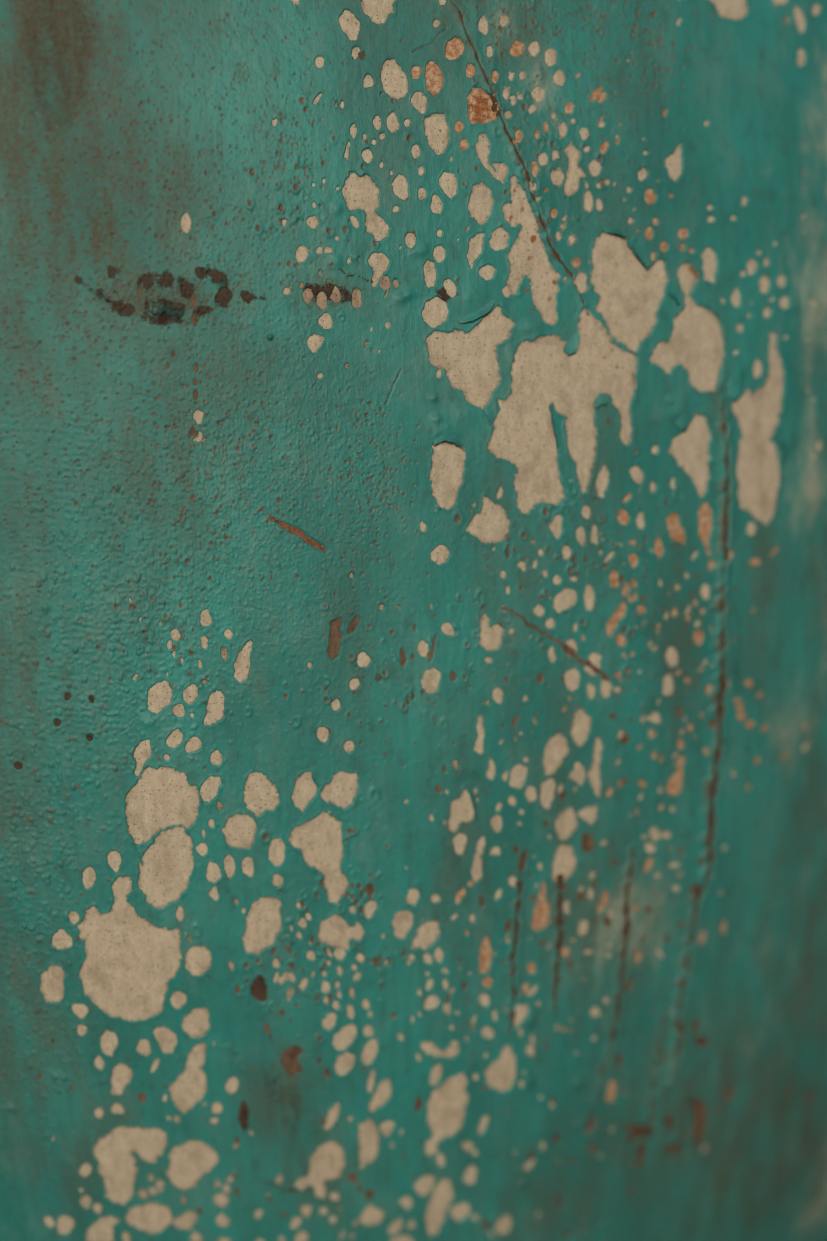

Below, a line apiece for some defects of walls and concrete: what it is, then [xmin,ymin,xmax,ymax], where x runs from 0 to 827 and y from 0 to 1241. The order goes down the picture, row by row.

peeling [339,0,395,60]
peeling [478,15,583,119]
peeling [773,0,821,33]
peeling [797,49,805,67]
crack [412,1,610,340]
peeling [178,213,193,233]
peeling [188,363,205,442]
spalling [268,514,327,552]
peeling [283,37,789,980]
peeling [40,609,549,1241]
peeling [590,997,621,1041]
peeling [605,1054,627,1102]